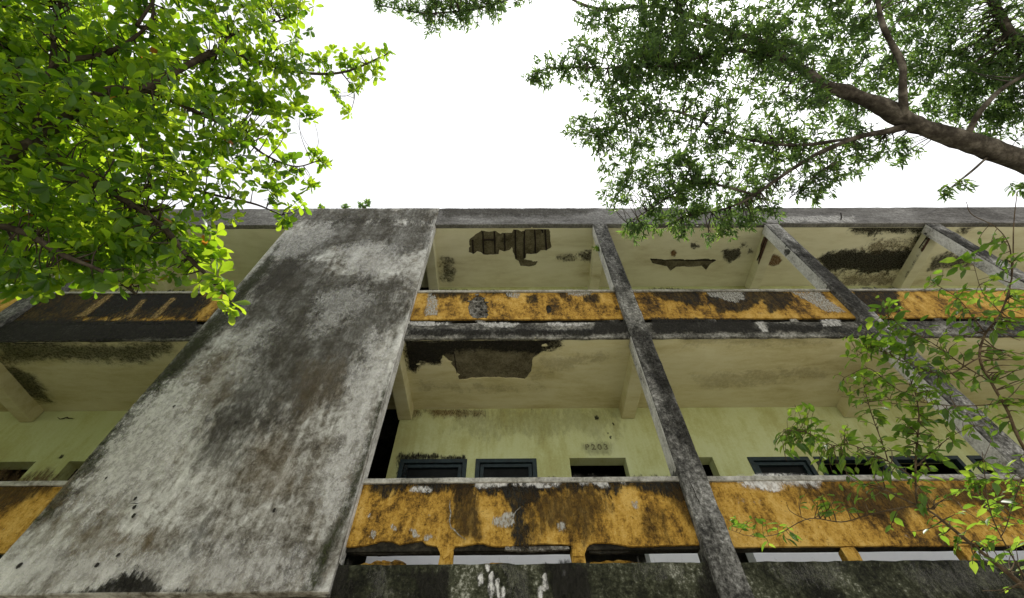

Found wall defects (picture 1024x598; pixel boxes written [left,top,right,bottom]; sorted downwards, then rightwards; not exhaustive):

water stain [0,289,211,343]
spalling [468,294,489,321]
spalling [468,223,551,267]
spalling [650,258,718,271]
water stain [788,228,928,340]
spalling [438,337,548,381]
water stain [204,208,841,516]
water stain [65,373,206,528]
water stain [368,451,693,549]
water stain [742,474,1024,525]
water stain [12,528,290,593]
water stain [326,559,353,598]